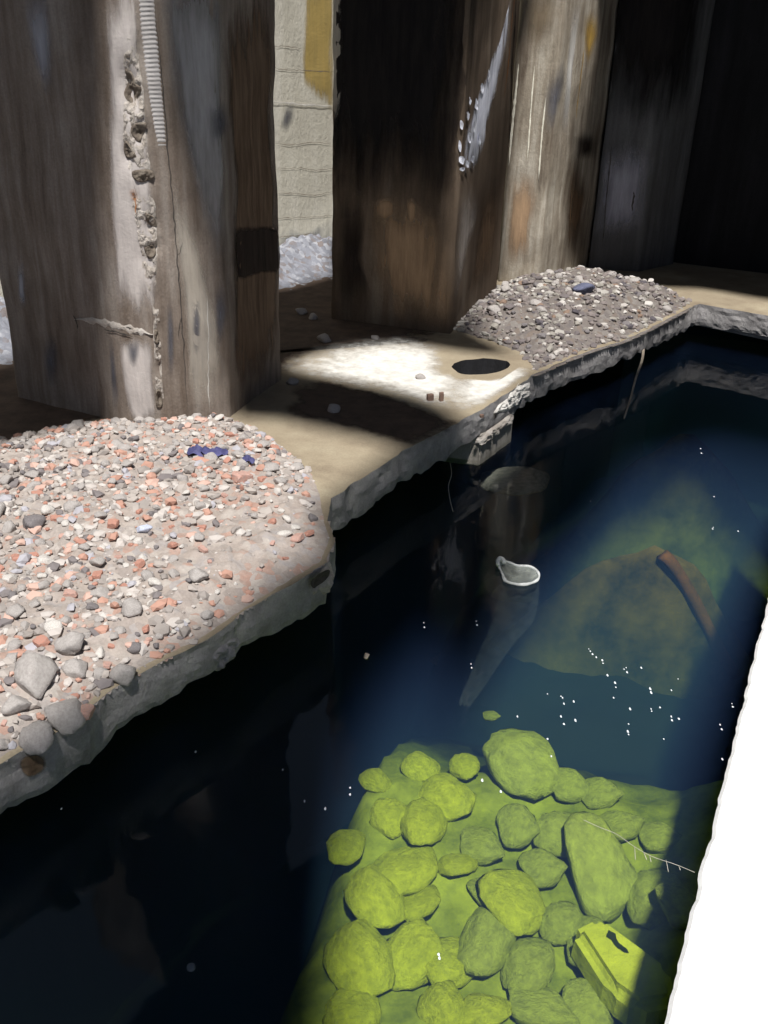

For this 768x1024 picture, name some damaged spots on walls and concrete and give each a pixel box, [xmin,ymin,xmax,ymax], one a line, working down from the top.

spalling [123,37,155,182]
spalling [132,195,164,408]
crack [155,9,188,407]
peeling [458,11,508,171]